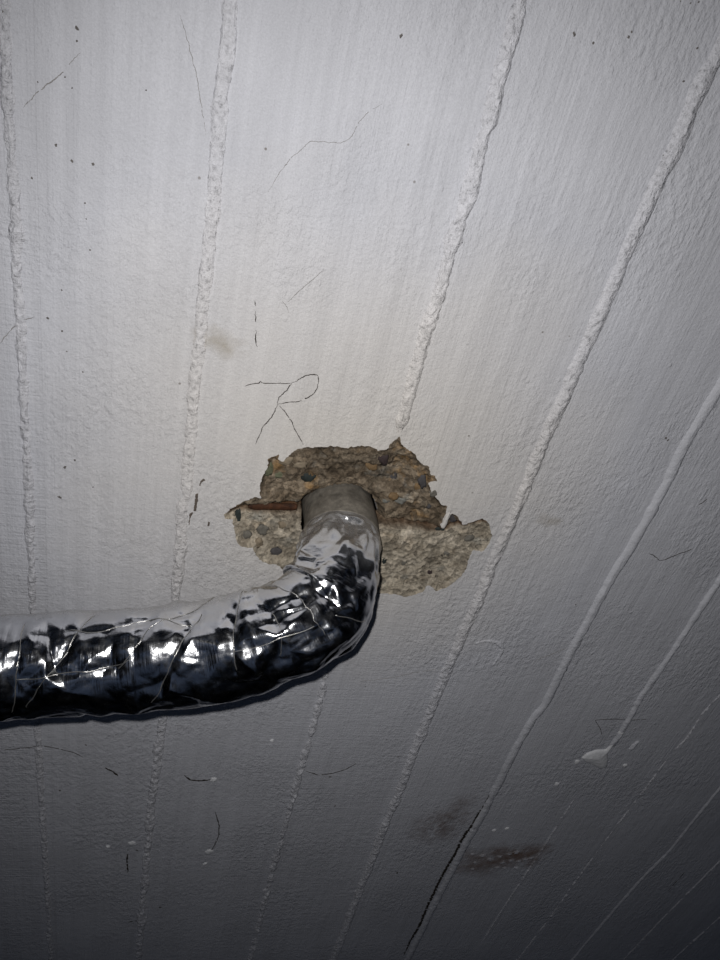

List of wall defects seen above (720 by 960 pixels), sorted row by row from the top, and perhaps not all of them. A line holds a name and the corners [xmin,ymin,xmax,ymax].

crack [246,374,319,443]
spalling [224,436,492,597]
crack [404,795,489,954]